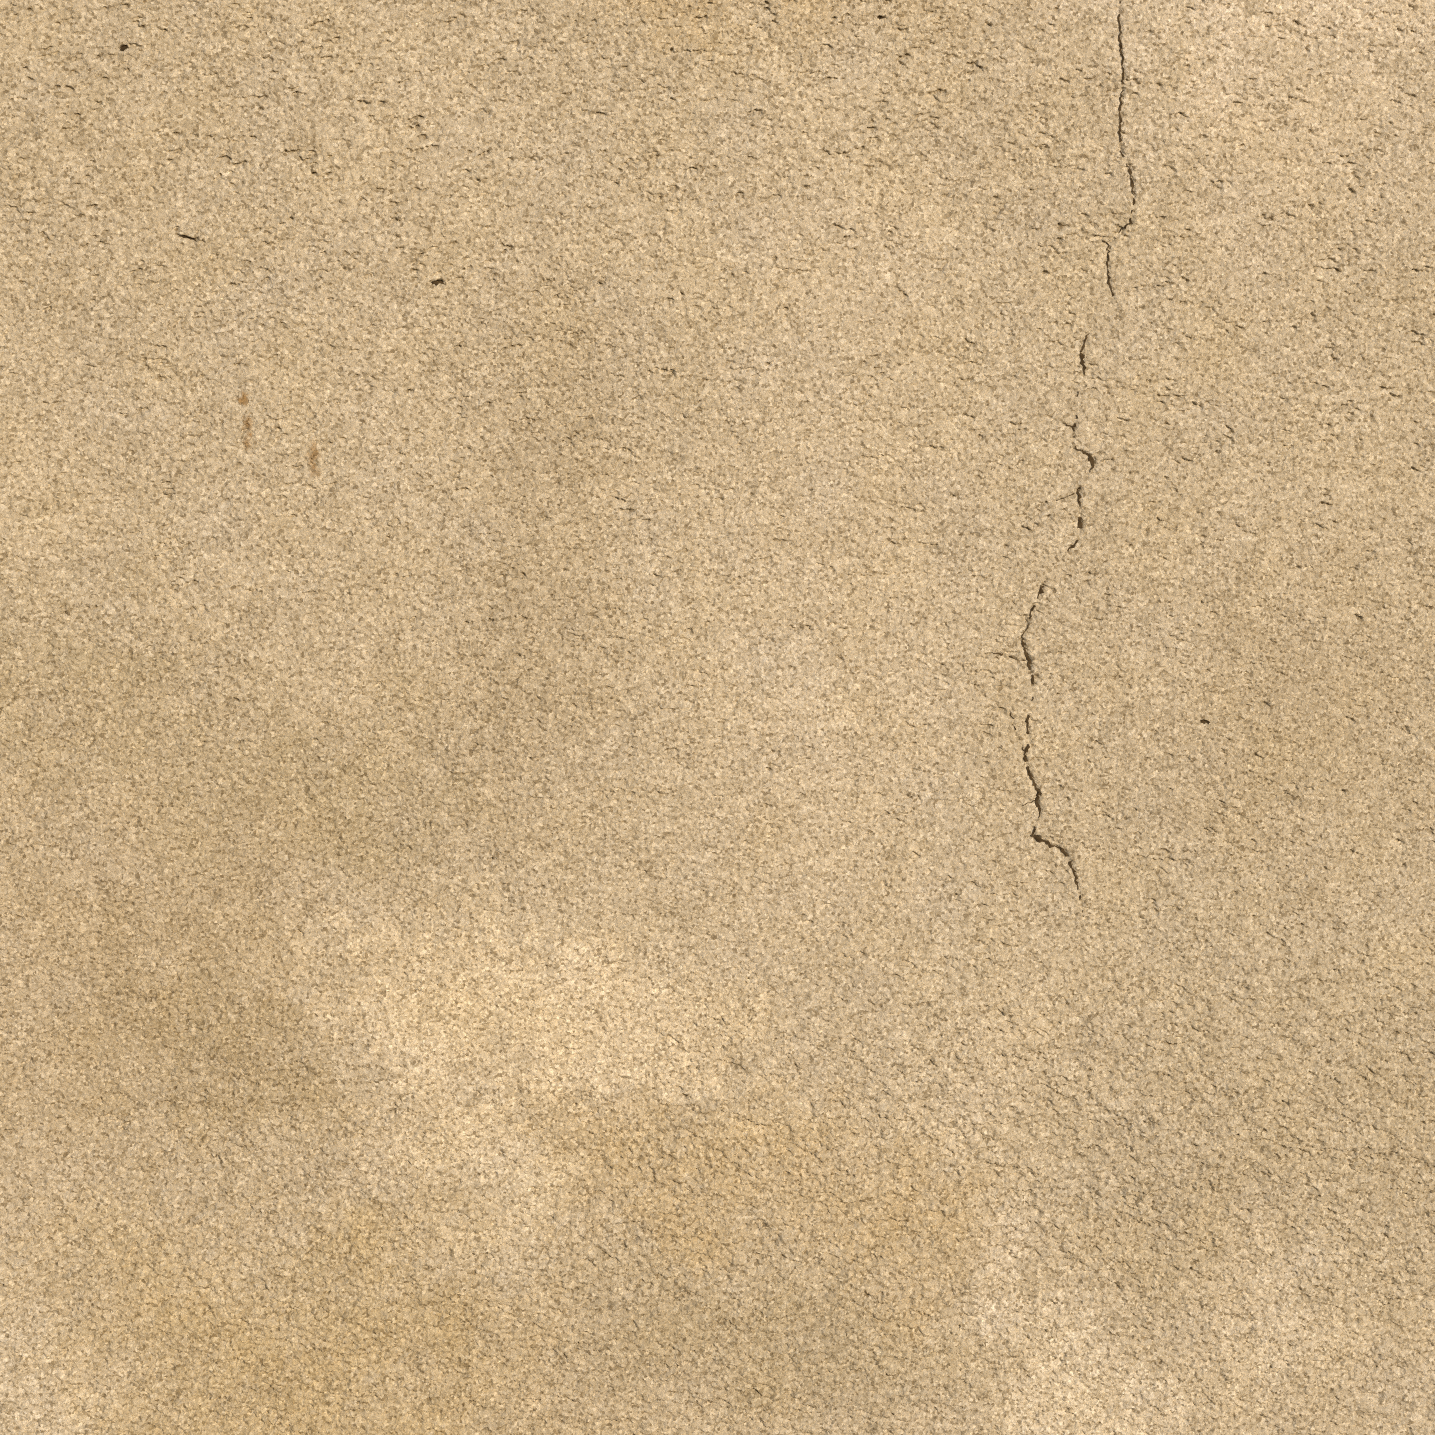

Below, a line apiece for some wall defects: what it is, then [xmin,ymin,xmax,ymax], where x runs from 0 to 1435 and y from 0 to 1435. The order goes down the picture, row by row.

crack [1093,1,1136,297]
crack [1056,333,1094,551]
crack [992,581,1083,913]